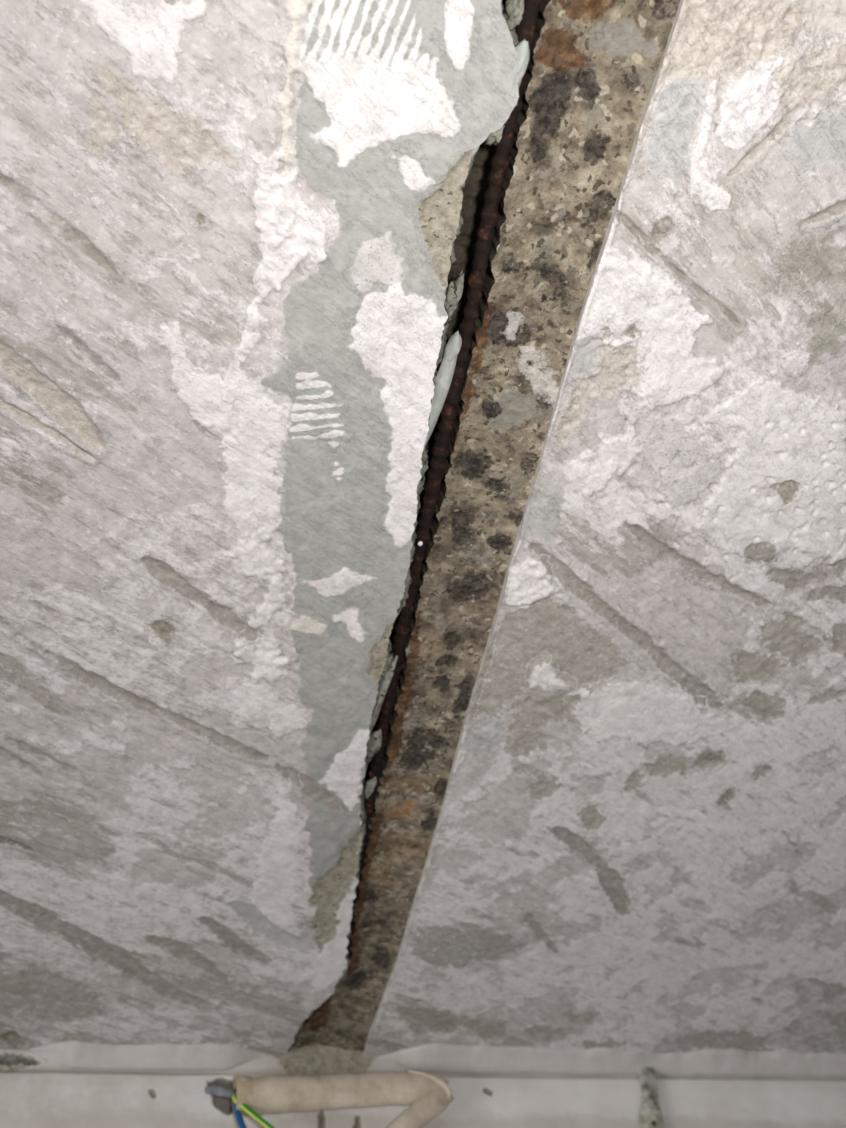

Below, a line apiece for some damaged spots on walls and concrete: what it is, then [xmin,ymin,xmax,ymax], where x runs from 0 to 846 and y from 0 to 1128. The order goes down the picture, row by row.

spalling [0,0,551,1051]
corrosion [302,0,619,1036]